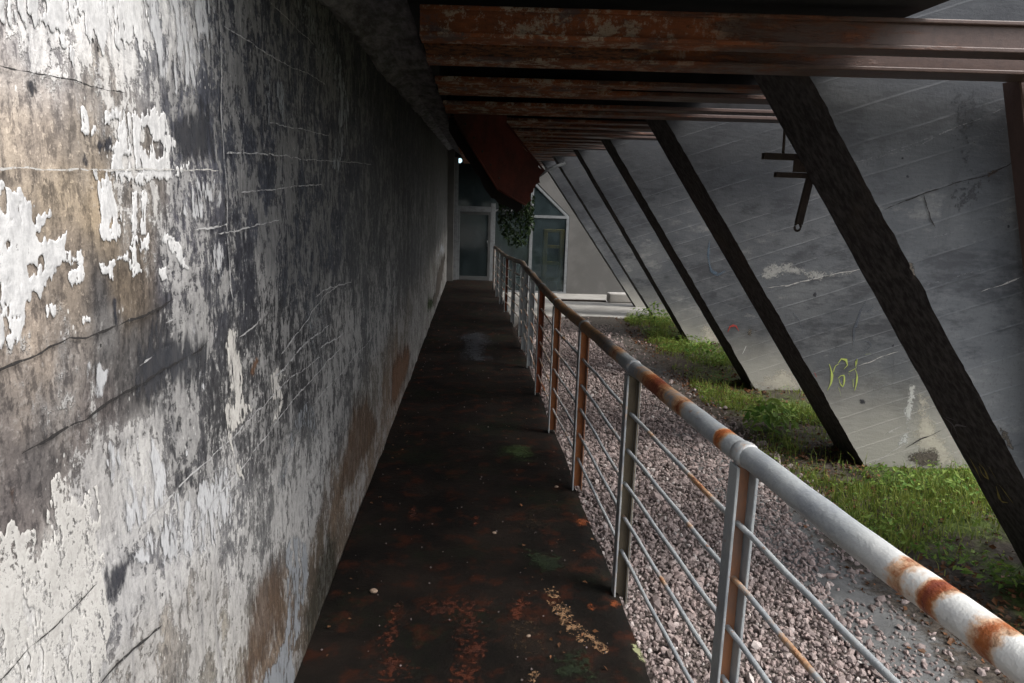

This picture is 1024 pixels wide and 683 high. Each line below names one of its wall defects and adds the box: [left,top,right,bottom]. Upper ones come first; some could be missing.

crack [1,66,125,93]
peeling [0,0,215,95]
water stain [174,101,215,162]
peeling [81,105,221,280]
crack [885,163,1011,226]
peeling [0,180,85,350]
crack [0,299,173,371]
crack [22,340,209,454]
crack [0,583,98,681]
peeling [0,472,110,683]
rust [306,534,337,643]
rust [421,597,493,683]